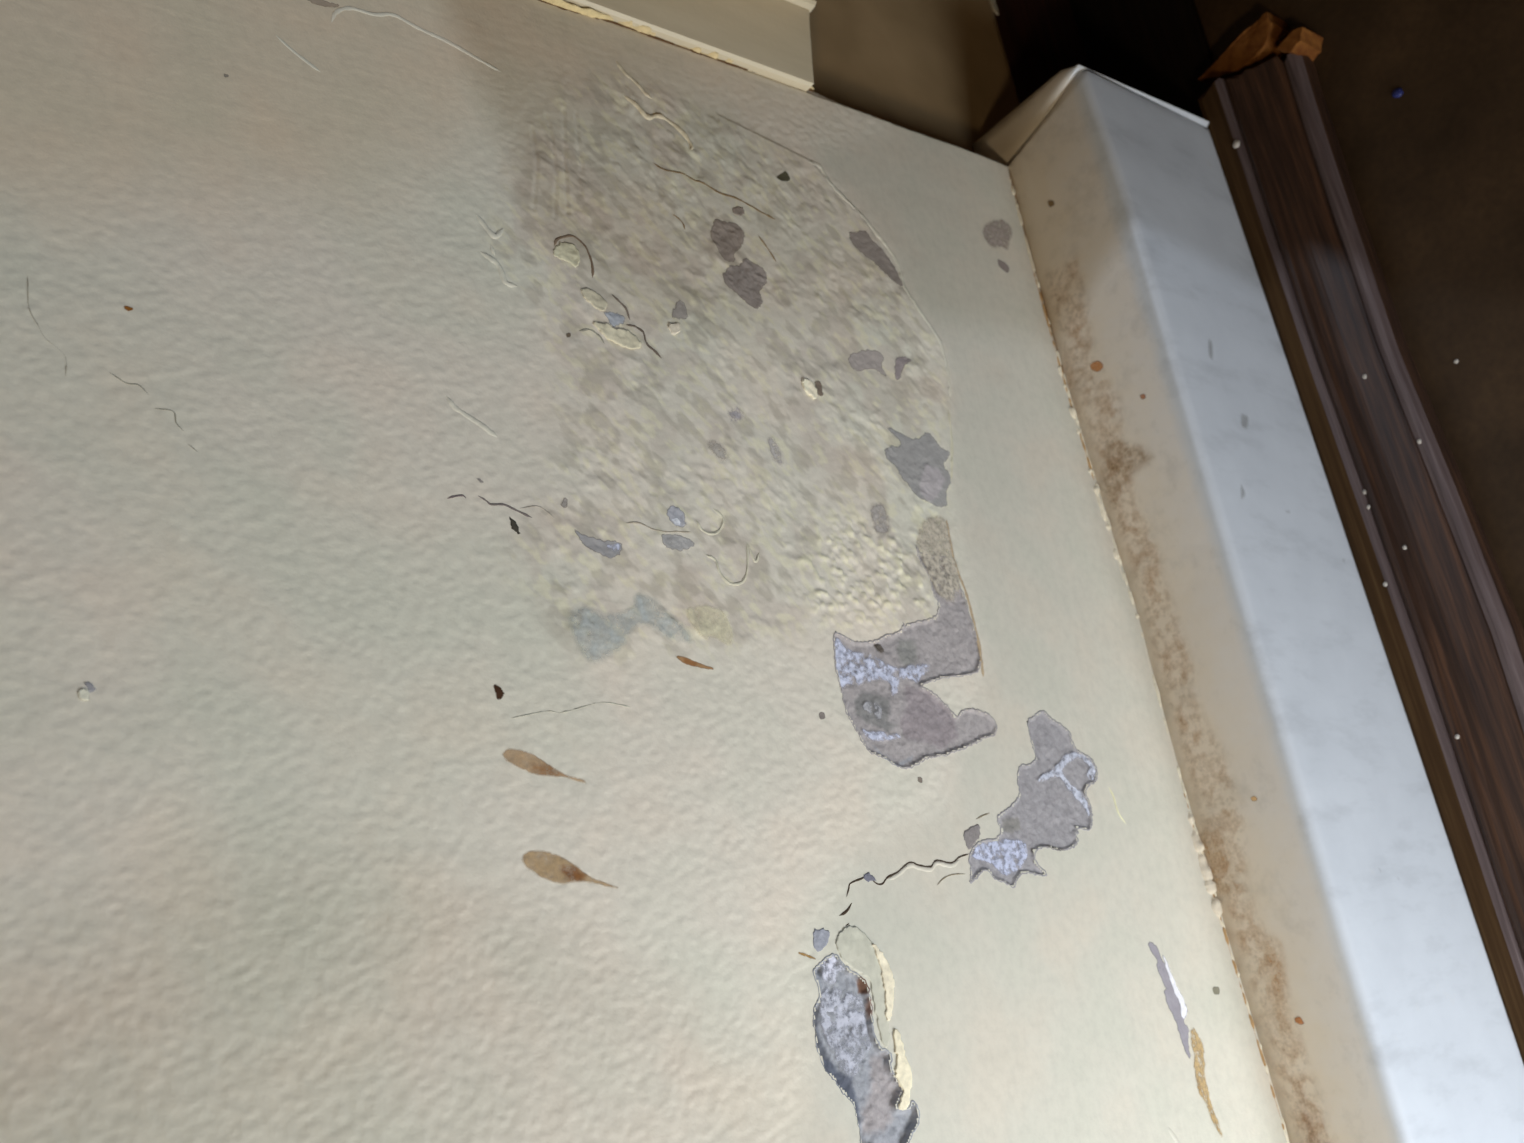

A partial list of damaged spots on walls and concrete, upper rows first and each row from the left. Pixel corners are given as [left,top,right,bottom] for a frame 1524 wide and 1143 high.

peeling [711,206,767,308]
peeling [850,231,903,286]
water stain [575,596,731,669]
flaking render [833,428,998,769]
flaking render [963,710,1098,888]
crack [839,854,968,926]
flaking render [813,926,920,1143]
peeling [1148,942,1222,1134]
water stain [1220,916,1285,1130]